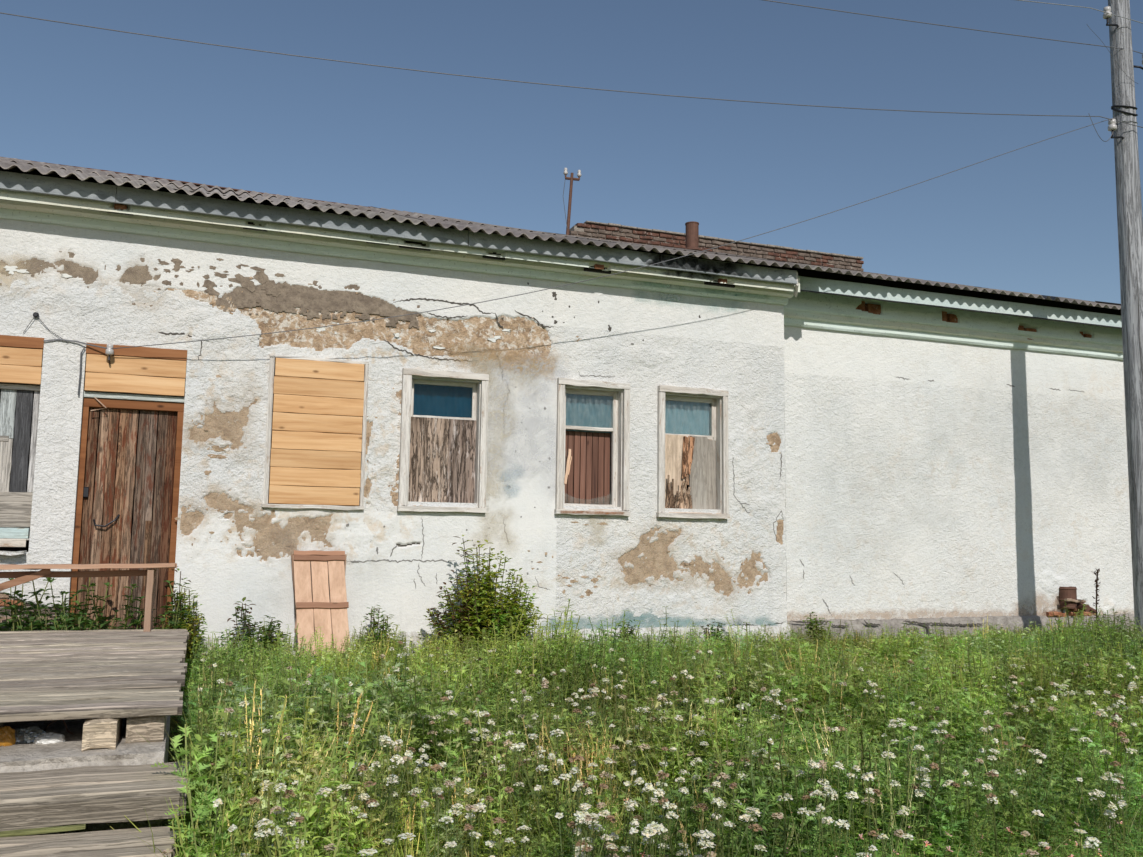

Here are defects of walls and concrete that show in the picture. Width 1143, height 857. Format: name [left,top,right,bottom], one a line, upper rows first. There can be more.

spalling [0,251,575,368]
spalling [188,399,257,475]
spalling [766,432,781,453]
spalling [175,489,333,562]
spalling [618,526,768,597]
spalling [776,519,784,545]
spalling [0,593,66,631]